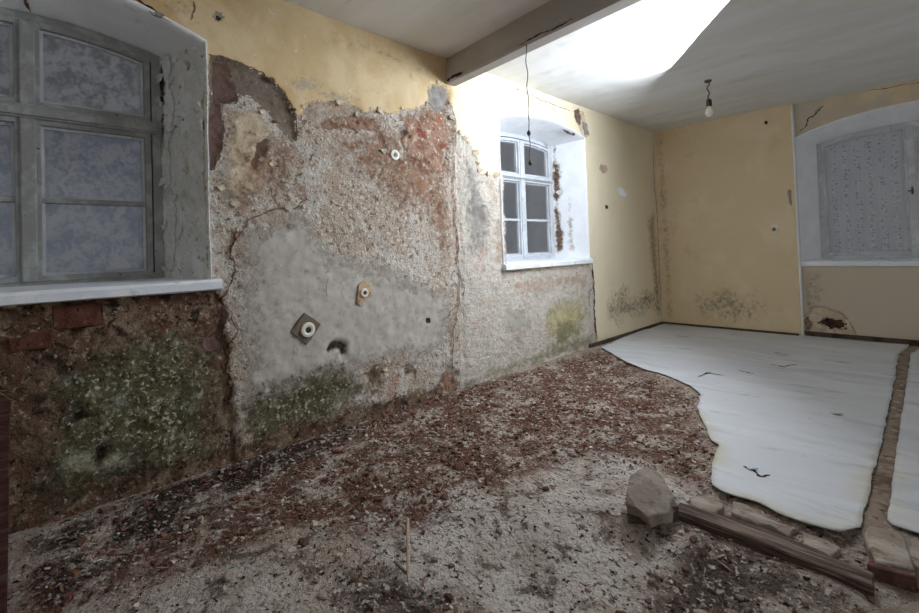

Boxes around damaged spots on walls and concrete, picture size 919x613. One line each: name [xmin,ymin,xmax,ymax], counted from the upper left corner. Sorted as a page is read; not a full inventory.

crack [137,0,196,23]
crack [203,189,308,417]
peeling [0,54,596,535]
damp [546,299,587,343]
spalling [804,303,856,335]